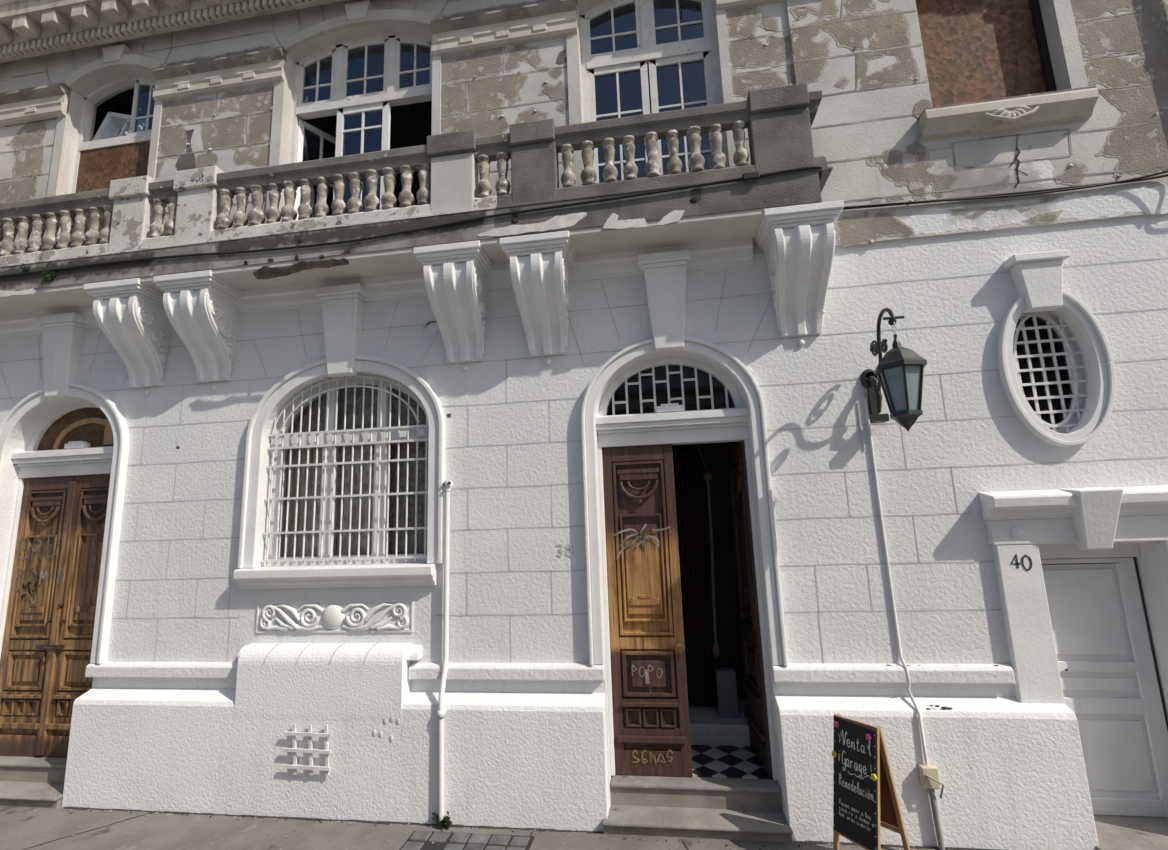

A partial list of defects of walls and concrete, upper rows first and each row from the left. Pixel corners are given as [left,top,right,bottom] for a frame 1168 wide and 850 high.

peeling [0,119,48,203]
peeling [155,84,274,180]
spalling [244,237,351,280]
peeling [441,44,569,137]
peeling [727,0,920,97]
peeling [836,133,961,246]
spalling [913,99,931,118]
peeling [951,208,990,219]
crack [1009,148,1028,188]
peeling [1016,0,1168,224]